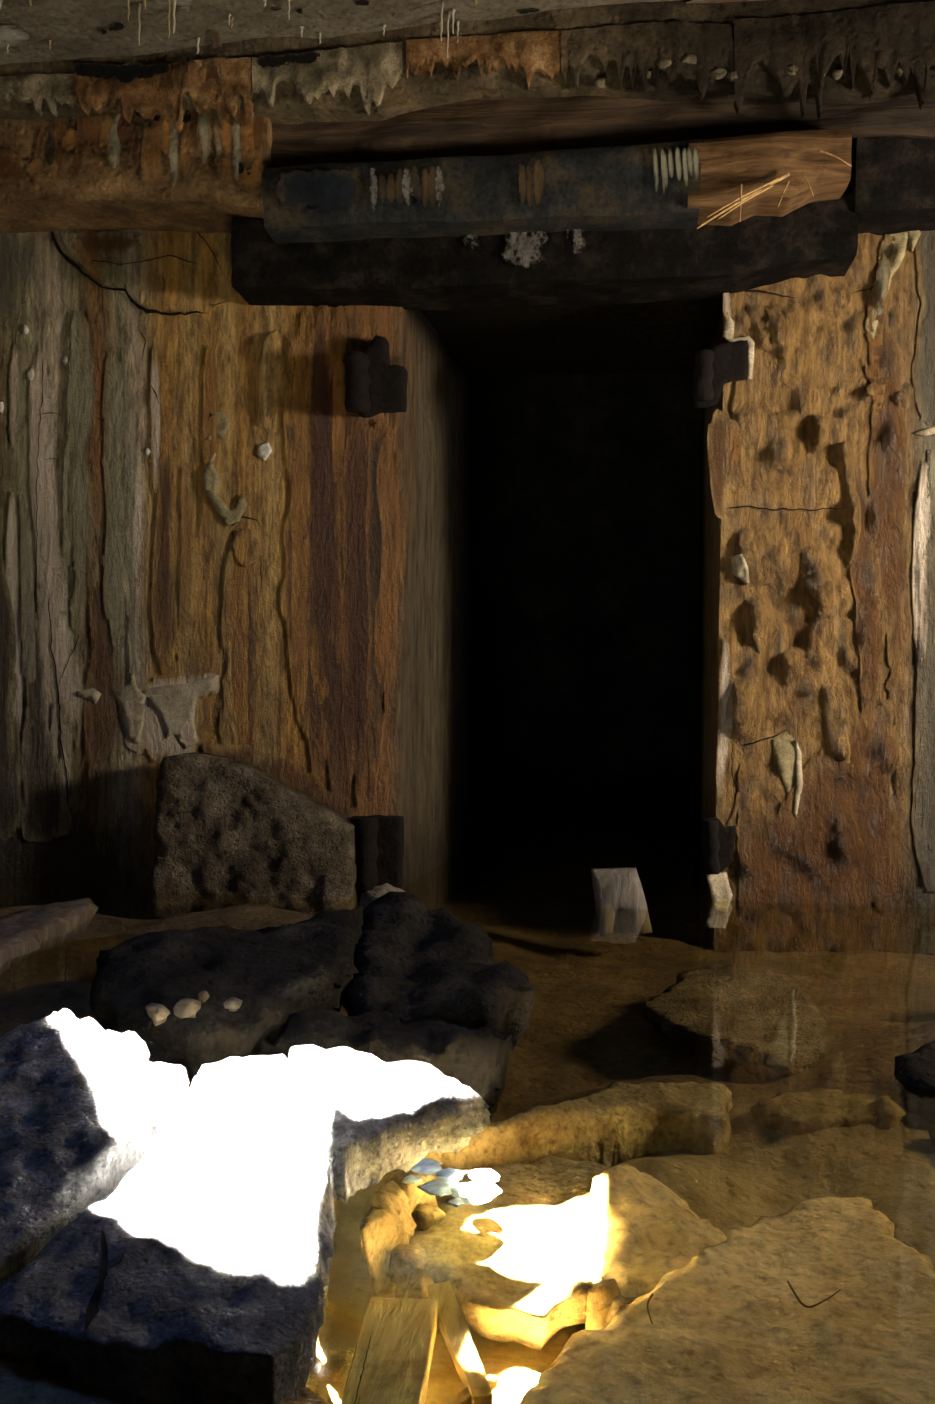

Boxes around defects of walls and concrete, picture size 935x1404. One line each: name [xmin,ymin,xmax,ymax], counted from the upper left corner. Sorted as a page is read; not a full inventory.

crack [51,231,229,419]
leakage [723,293,732,320]
leakage [870,235,896,338]
leakage [912,230,935,426]
leakage [716,636,733,799]
leakage [911,449,935,892]